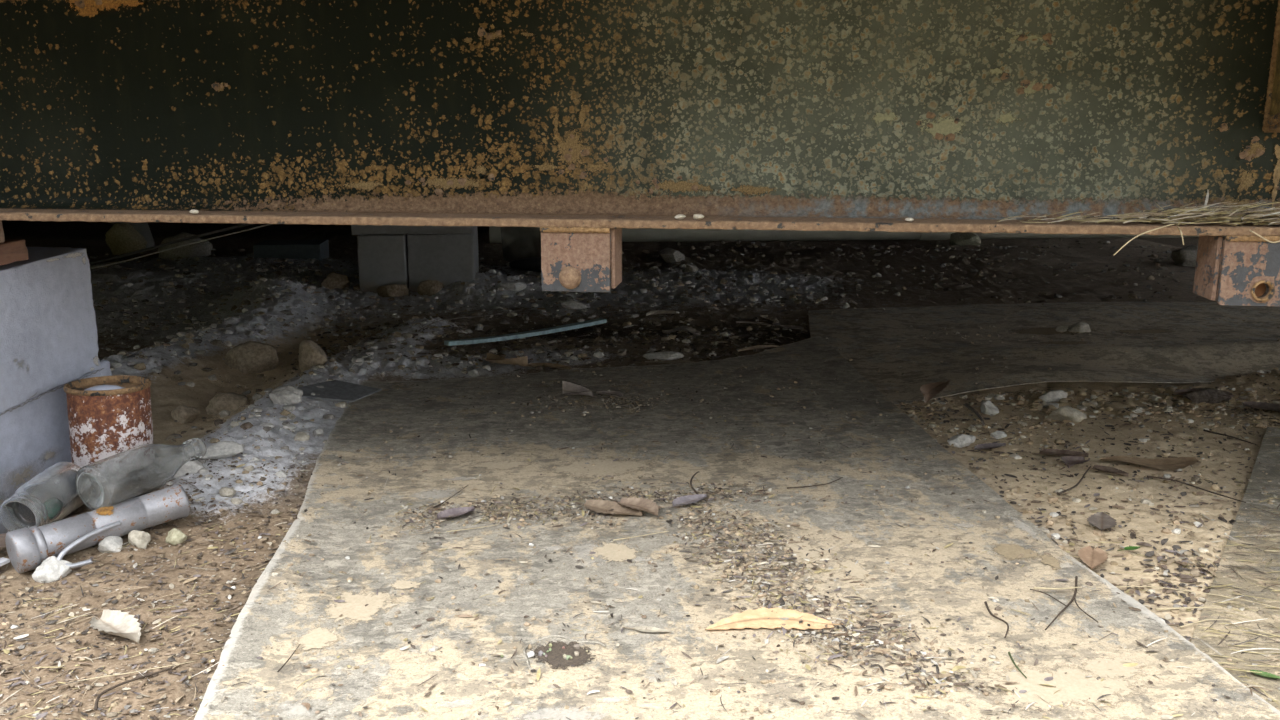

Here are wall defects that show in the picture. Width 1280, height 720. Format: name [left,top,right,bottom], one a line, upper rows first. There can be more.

rust [63,0,144,18]
rust [1222,136,1280,213]